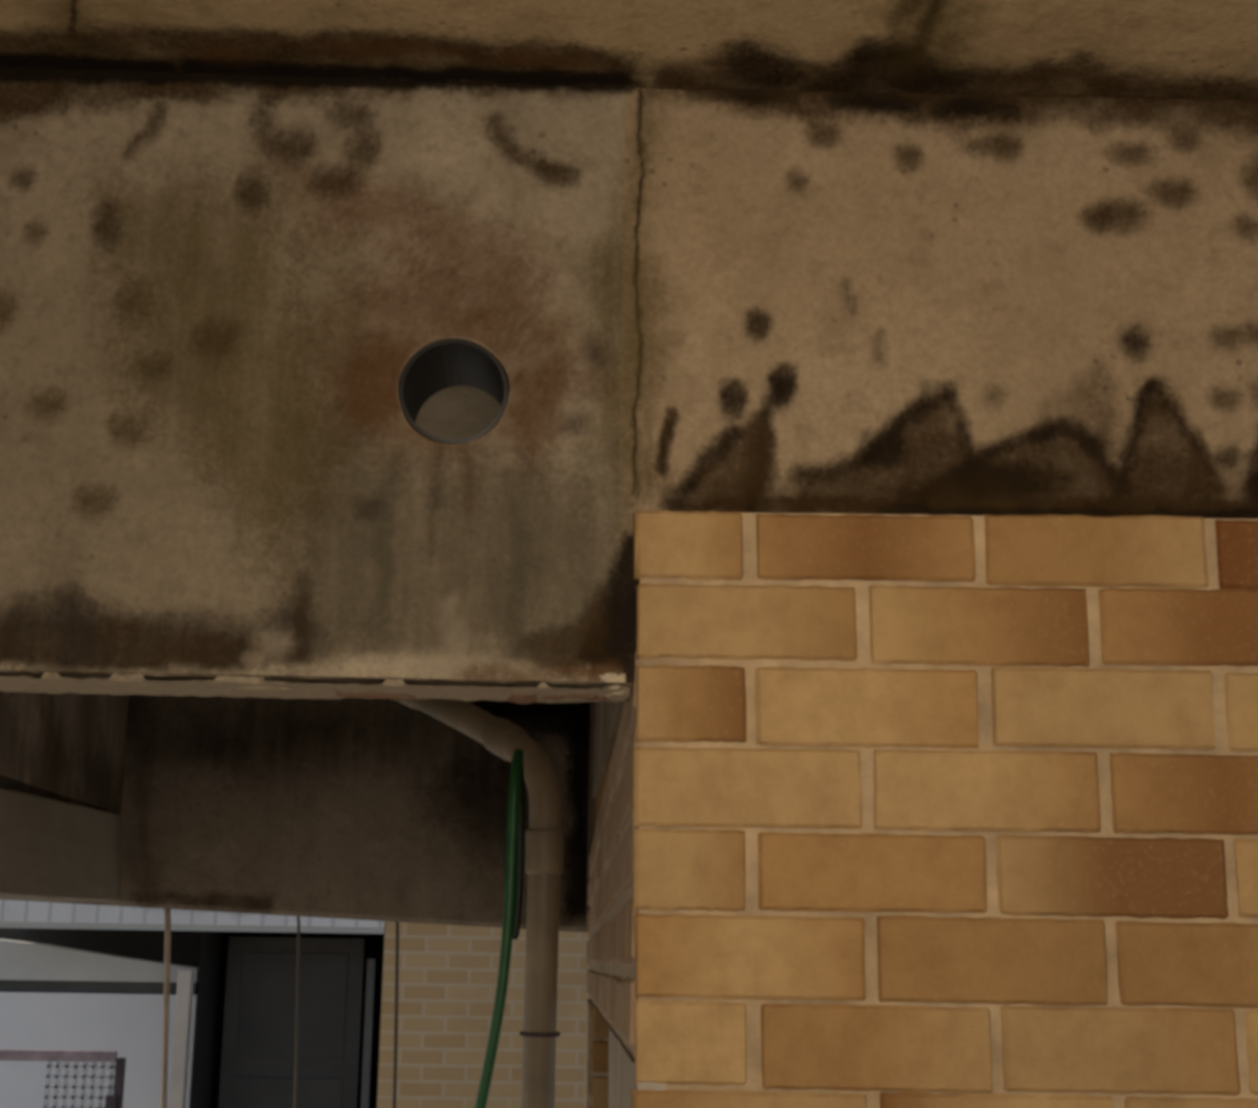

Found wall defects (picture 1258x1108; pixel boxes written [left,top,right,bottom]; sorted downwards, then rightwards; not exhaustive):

leakage [0,27,1258,159]
leakage [748,311,769,337]
leakage [1123,327,1148,356]
leakage [668,365,1258,519]
leakage [0,596,313,675]